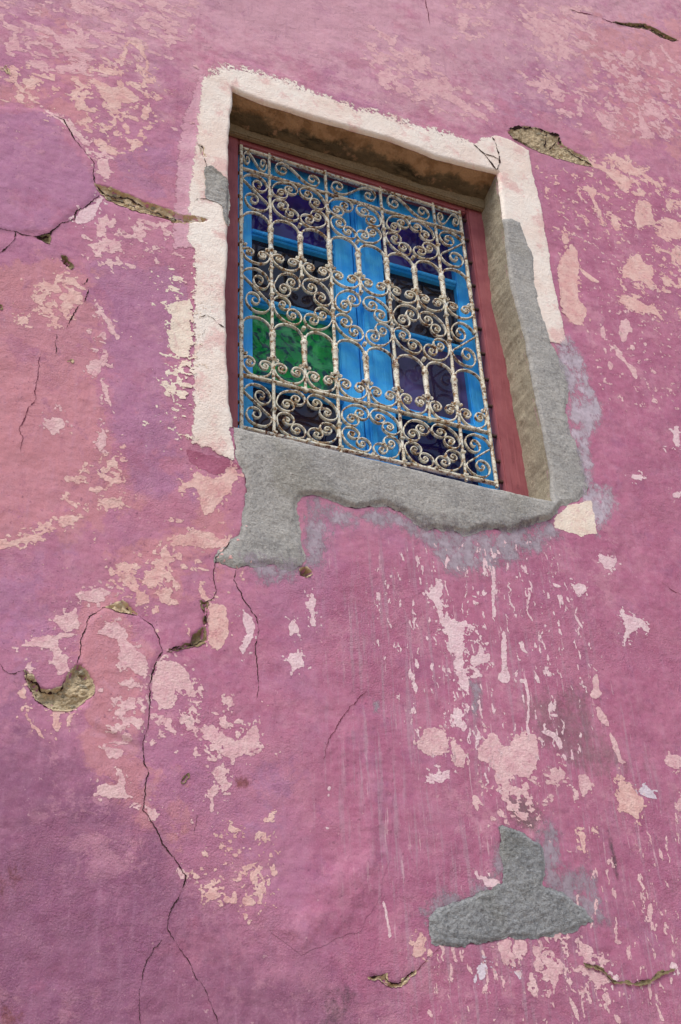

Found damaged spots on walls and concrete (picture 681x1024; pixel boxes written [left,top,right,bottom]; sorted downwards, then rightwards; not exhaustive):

crack [0,116,207,252]
peeling [0,192,213,550]
peeling [502,0,681,411]
crack [570,9,677,42]
peeling [12,460,283,925]
crack [77,541,259,1023]
peeling [374,500,681,1024]
crack [368,950,437,988]
crack [584,963,676,986]